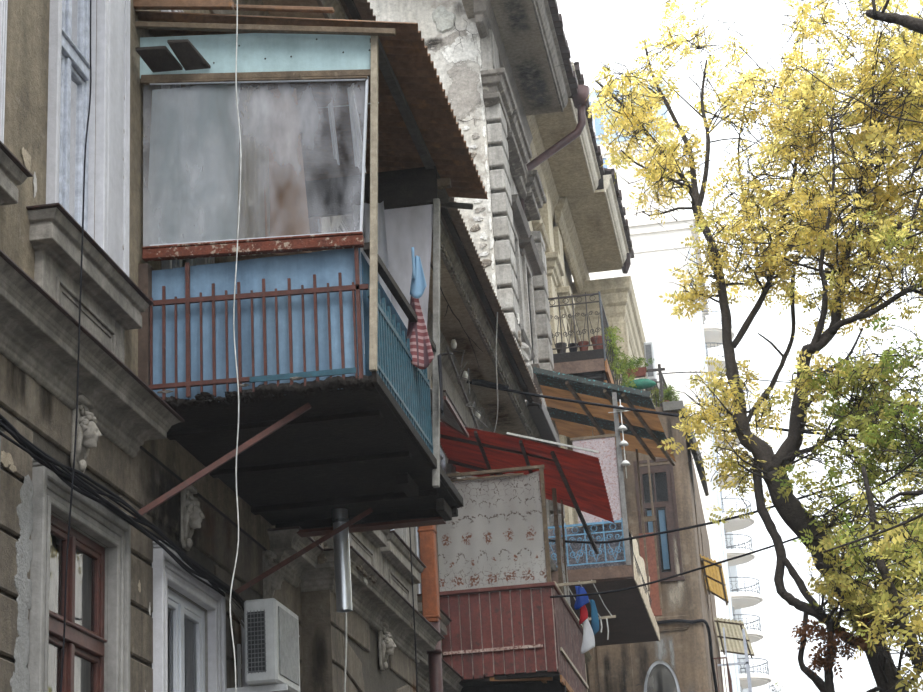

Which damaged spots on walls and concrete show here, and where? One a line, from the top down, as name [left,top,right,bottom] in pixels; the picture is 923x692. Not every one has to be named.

flaking render [429,5,496,286]
flaking render [1,451,34,692]